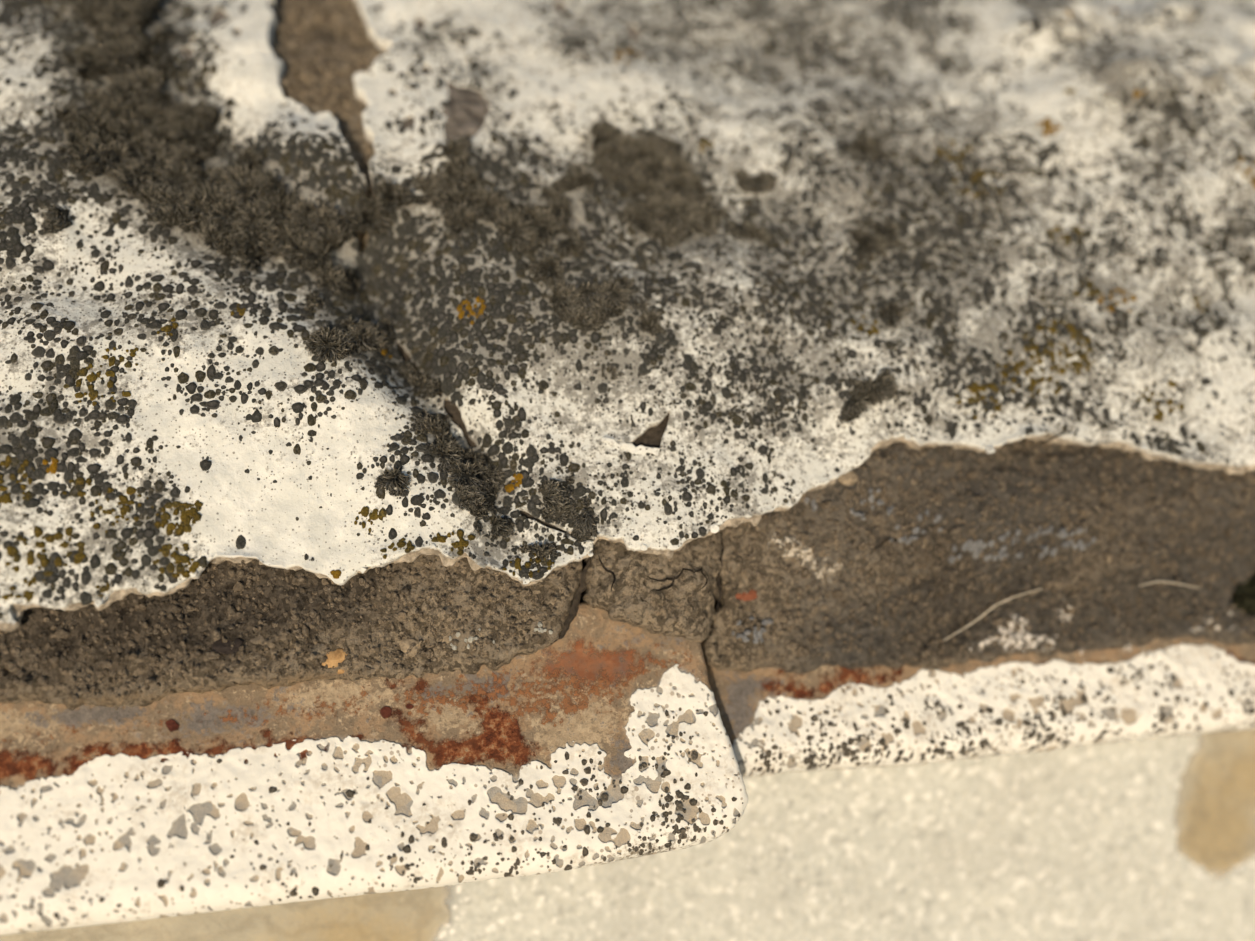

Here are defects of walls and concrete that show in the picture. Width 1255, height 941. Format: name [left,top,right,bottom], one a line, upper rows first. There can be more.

spalling [271,0,384,195]
crack [397,343,411,362]
crack [438,391,477,448]
crack [517,510,567,533]
crack [598,555,616,591]
crack [649,540,724,610]
spalling [703,434,1255,675]
spalling [0,544,594,711]
corrosion [0,639,693,787]
water stain [1176,730,1255,876]
water stain [0,886,450,941]